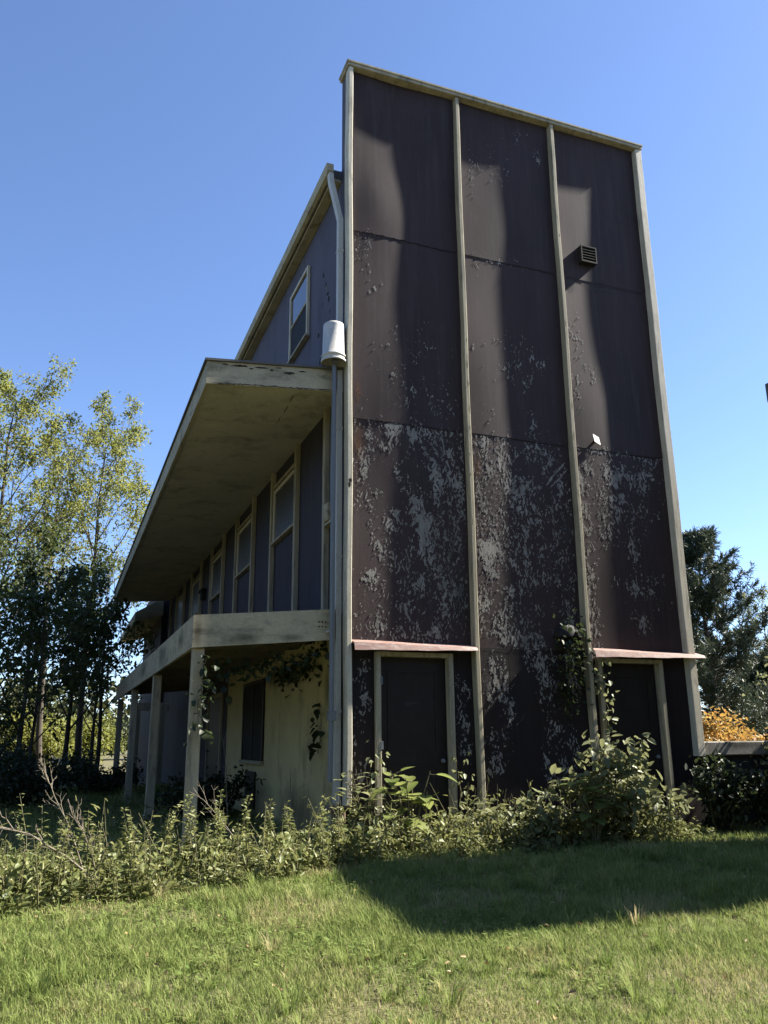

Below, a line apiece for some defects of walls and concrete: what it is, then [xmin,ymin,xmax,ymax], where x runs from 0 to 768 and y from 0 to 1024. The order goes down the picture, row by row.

peeling [348,317,672,788]